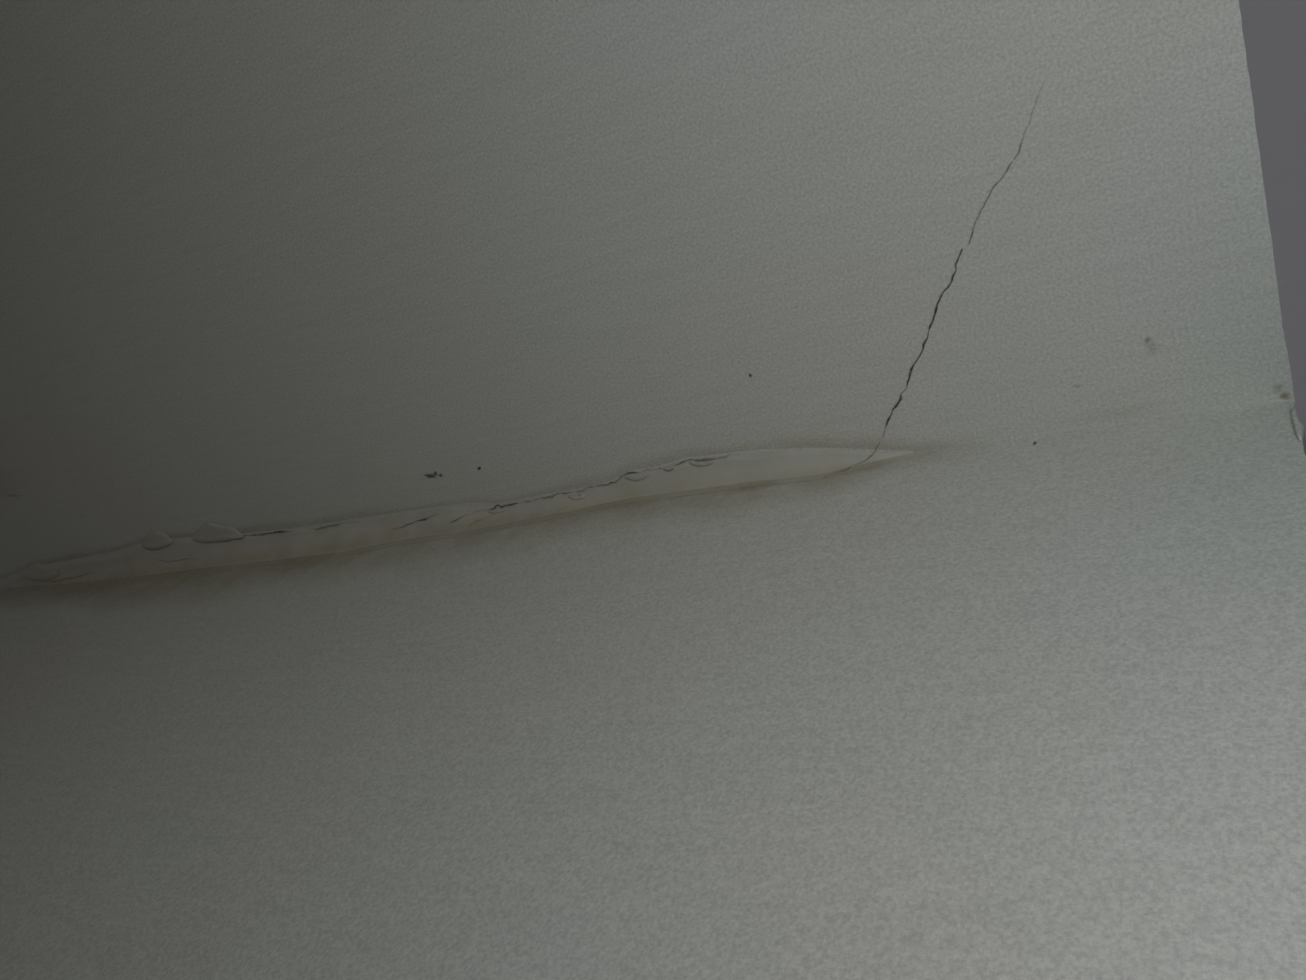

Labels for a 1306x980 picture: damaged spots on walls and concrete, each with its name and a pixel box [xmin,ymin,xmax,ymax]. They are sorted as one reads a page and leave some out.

crack [886,176,1004,426]